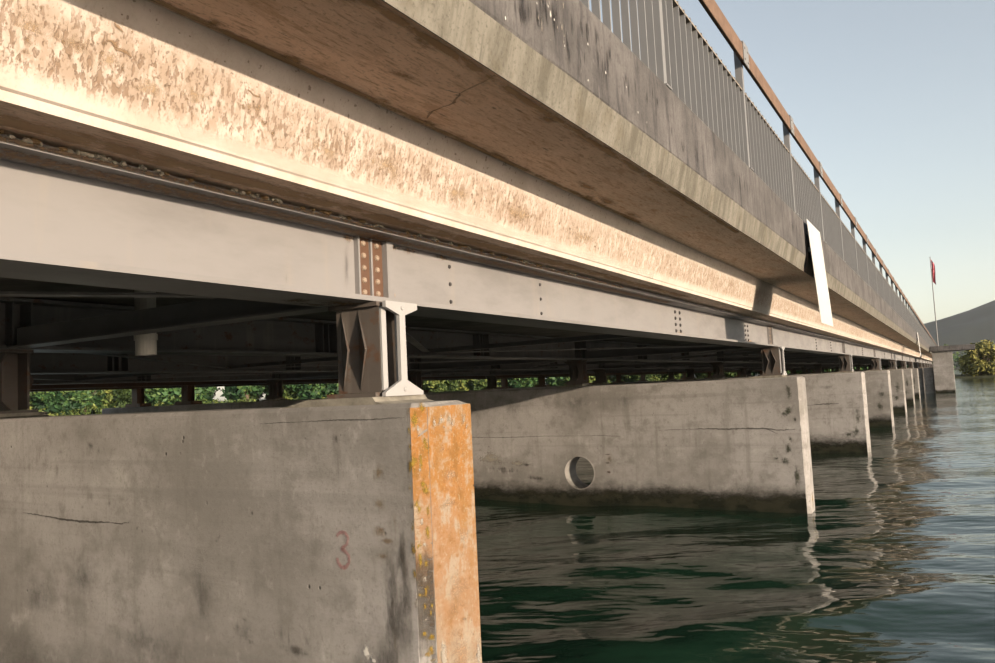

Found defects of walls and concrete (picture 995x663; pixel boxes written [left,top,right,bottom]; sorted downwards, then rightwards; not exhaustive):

crack [427,75,495,118]
crack [668,427,794,435]
crack [27,513,127,524]
rust [427,404,482,663]